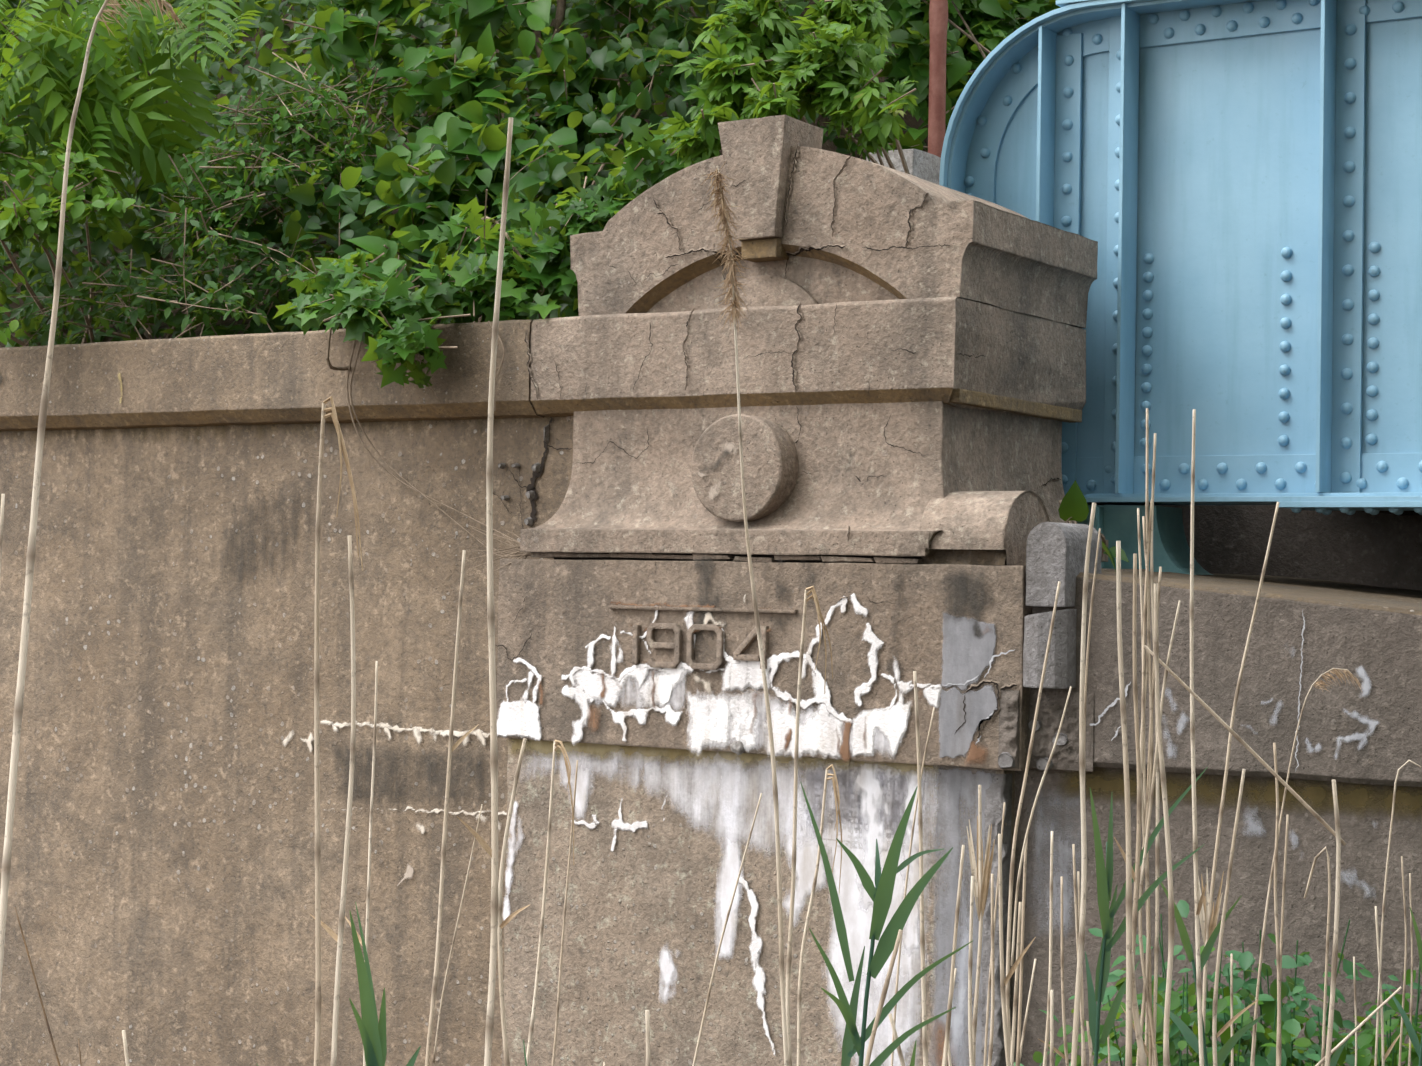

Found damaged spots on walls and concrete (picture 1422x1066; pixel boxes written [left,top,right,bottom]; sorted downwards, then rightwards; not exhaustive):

crack [493,329,649,527]
crack [633,308,695,392]
crack [608,178,749,290]
crack [747,144,950,482]
damp [320,560,992,1066]